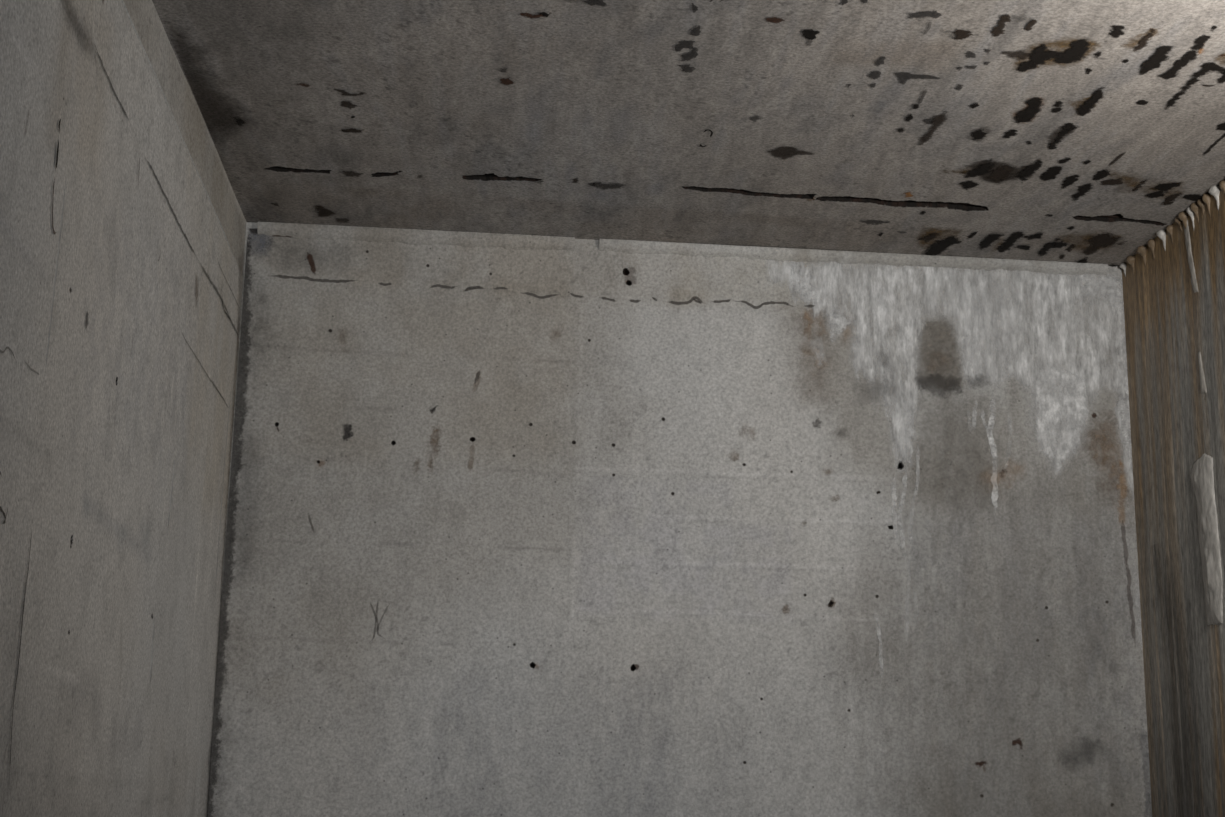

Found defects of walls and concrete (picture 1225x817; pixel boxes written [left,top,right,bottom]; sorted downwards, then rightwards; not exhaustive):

leakage [1110,26,1125,38]
crack [98,54,128,118]
peeling [956,49,991,90]
leakage [1139,26,1225,110]
crack [148,162,194,252]
spalling [1045,213,1170,230]
crack [277,275,391,286]
crack [431,284,814,309]
leakage [768,87,1225,548]